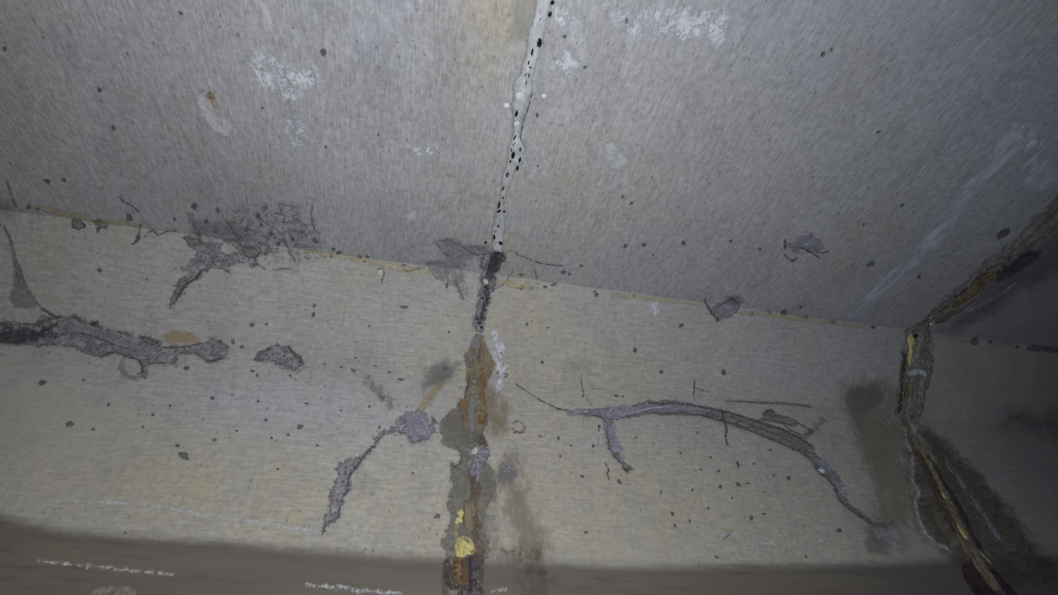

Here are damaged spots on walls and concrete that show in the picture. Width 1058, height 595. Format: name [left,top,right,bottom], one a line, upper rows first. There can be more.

crack [0,183,59,319]
crack [118,196,177,245]
spalling [170,207,316,308]
crack [498,250,562,287]
spalling [254,343,305,371]
corrosion [456,333,506,434]
leakage [0,197,1058,595]
crack [515,376,601,439]
crack [1028,345,1058,353]
crack [322,408,438,535]